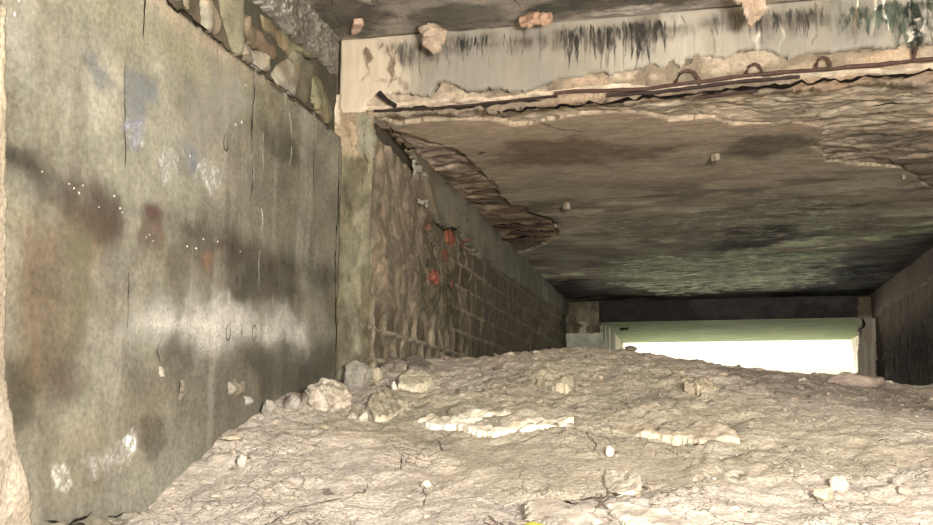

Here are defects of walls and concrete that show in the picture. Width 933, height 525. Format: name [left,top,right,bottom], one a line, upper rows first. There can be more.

water stain [315,0,391,37]
water stain [387,44,428,83]
flaking render [418,23,449,55]
water stain [410,4,506,57]
water stain [519,0,693,69]
corrosion [374,46,933,114]
water stain [713,13,745,29]
flaking render [733,0,781,28]
water stain [755,3,830,35]
water stain [846,0,933,54]
spalling [364,44,933,252]
water stain [143,302,318,377]